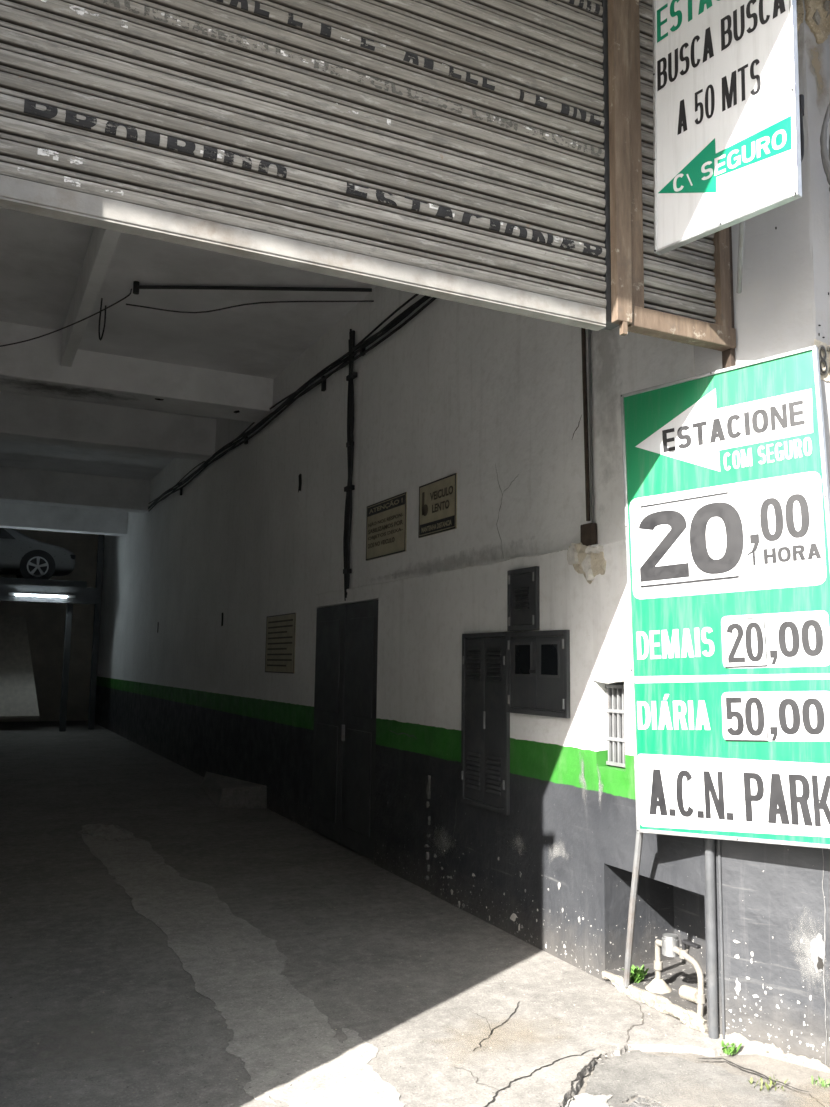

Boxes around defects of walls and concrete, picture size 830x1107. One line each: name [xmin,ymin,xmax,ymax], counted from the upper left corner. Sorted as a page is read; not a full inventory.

spalling [796,0,830,44]
flaking render [567,543,606,584]
spalling [801,933,824,977]
crack [626,995,644,1042]
spalling [585,940,830,1073]
crack [455,1001,601,1107]
crack [698,1058,825,1107]